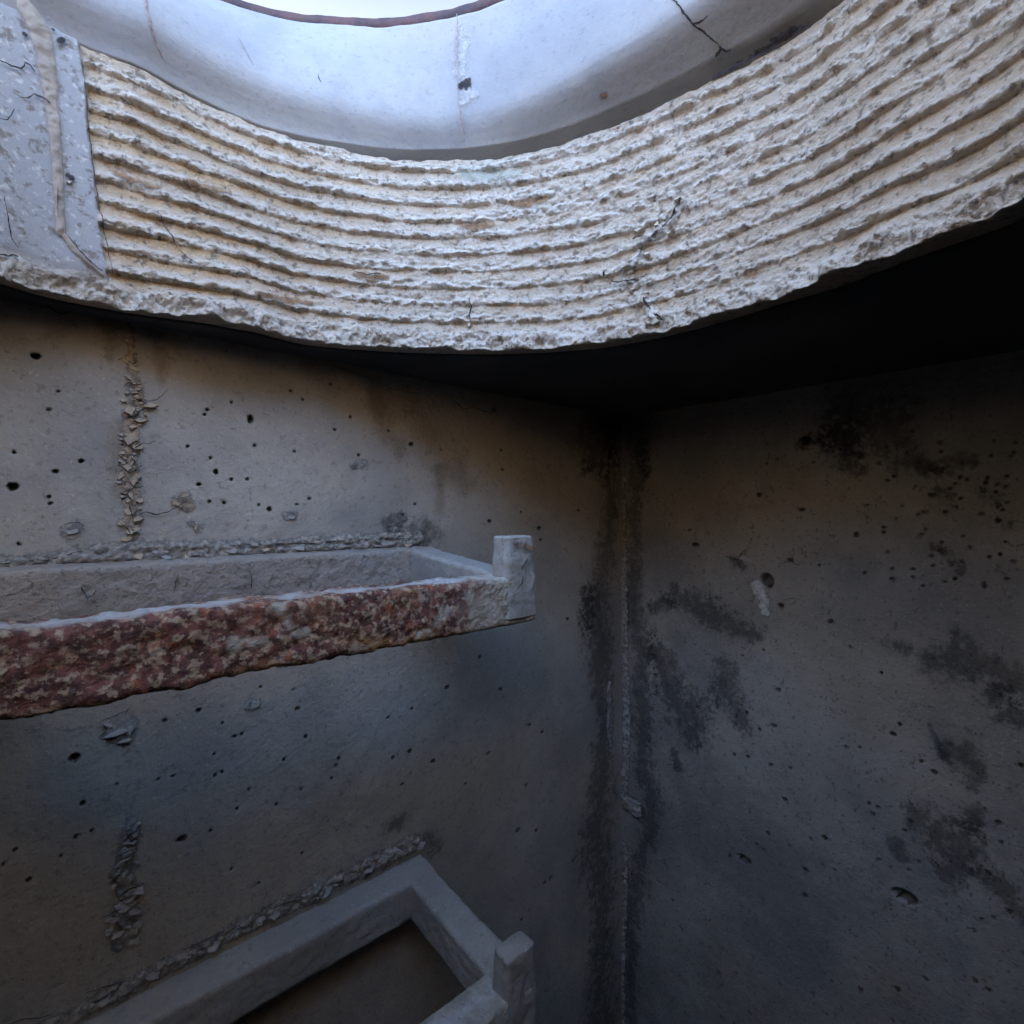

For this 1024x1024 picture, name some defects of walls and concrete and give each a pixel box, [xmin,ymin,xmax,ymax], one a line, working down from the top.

crack [673,0,722,51]
crack [0,60,51,120]
crack [0,197,19,257]
crack [602,197,686,326]
spalling [109,322,201,542]
damp [750,580,770,619]
spalling [96,704,139,744]
spalling [103,813,144,953]